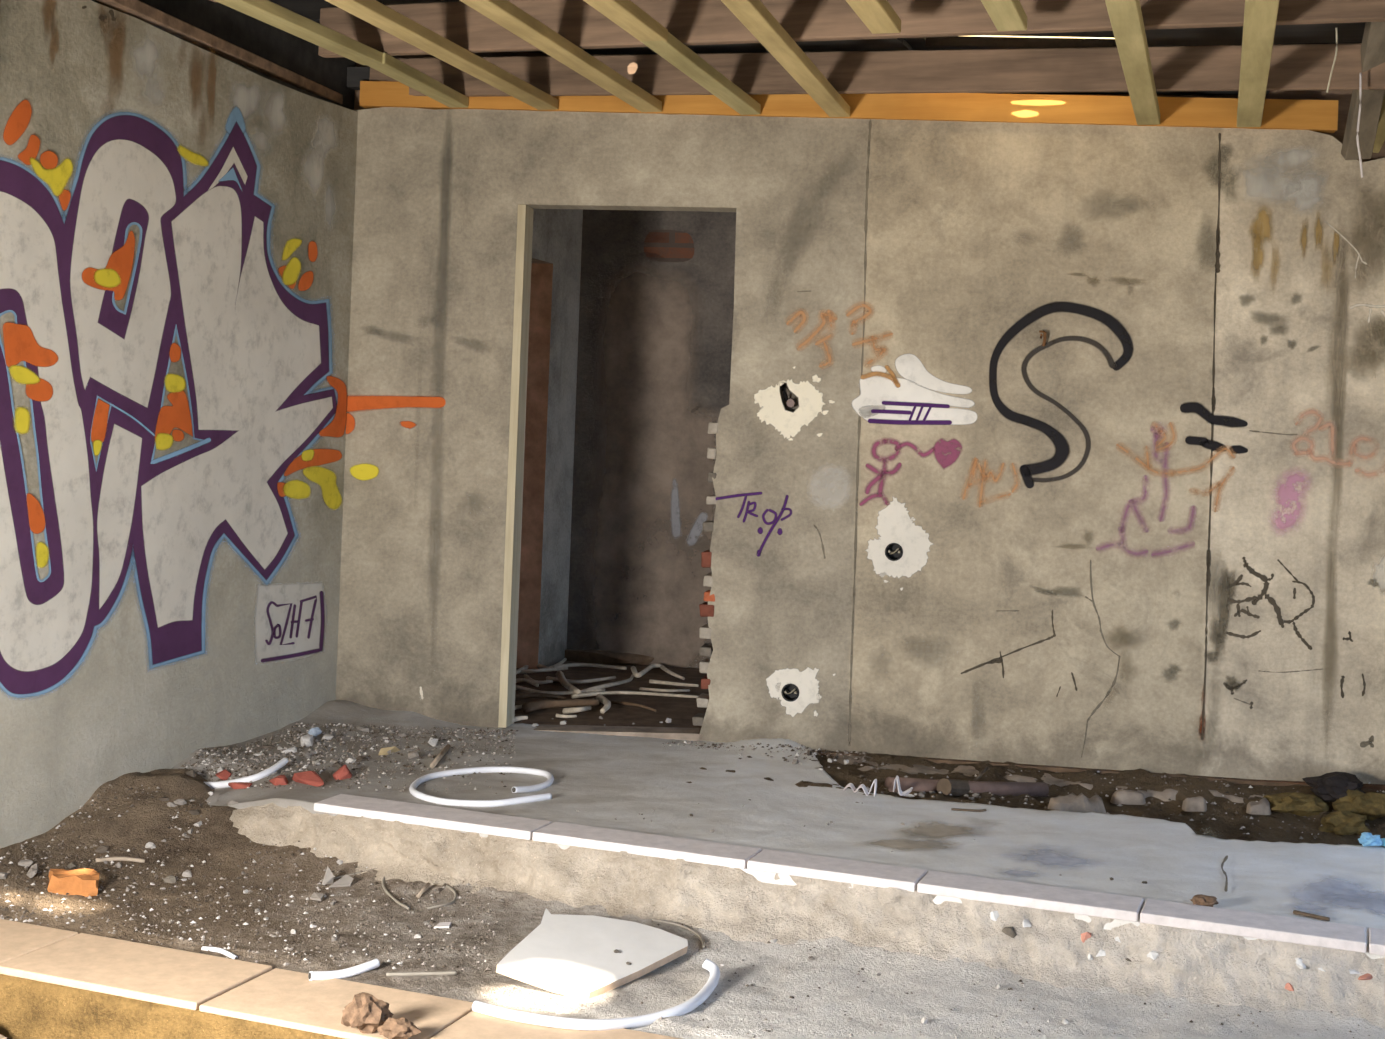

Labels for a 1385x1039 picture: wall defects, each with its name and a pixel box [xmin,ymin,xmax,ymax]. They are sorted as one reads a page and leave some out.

spalling [706,422,718,504]
spalling [692,550,715,726]
crack [961,610,1056,678]
crack [1056,560,1120,758]